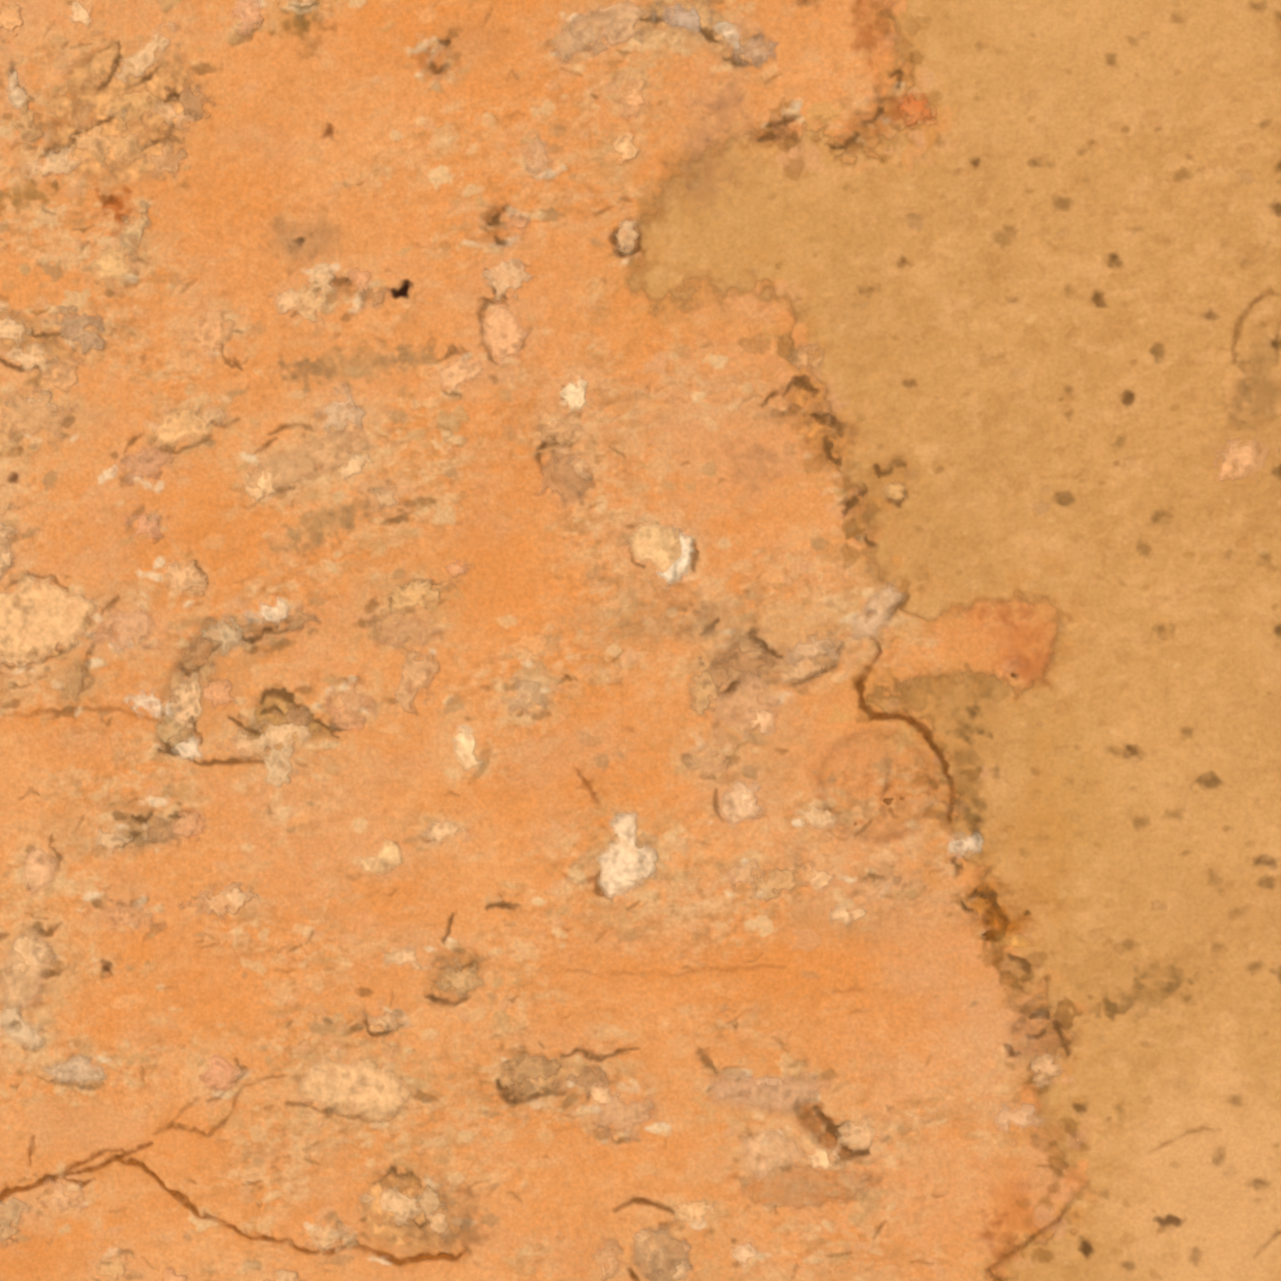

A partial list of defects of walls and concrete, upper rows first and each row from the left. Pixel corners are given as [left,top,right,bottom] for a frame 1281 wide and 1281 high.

spalling [559,0,776,66]
peeling [613,0,1281,1281]
crack [857,679,952,780]
peeling [596,813,657,897]
spalling [497,1049,653,1129]
crack [0,1144,336,1253]
crack [377,1252,462,1265]